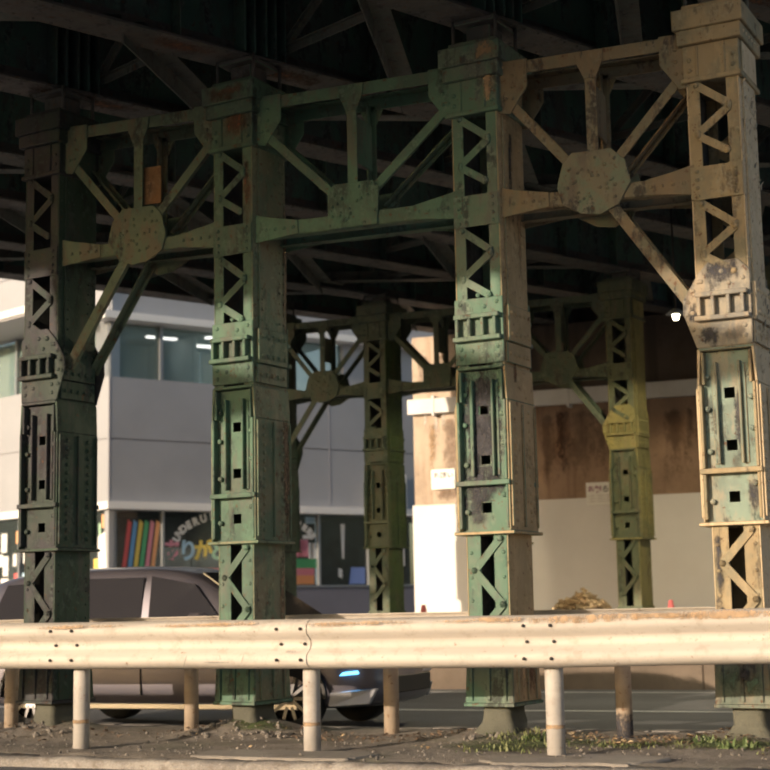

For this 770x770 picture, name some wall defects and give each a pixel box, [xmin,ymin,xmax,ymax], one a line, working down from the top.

peeling [706,259,738,282]
peeling [701,327,718,343]
leakage [424,413,445,465]
leakage [463,364,503,523]
leakage [749,484,759,507]
leakage [714,537,724,609]